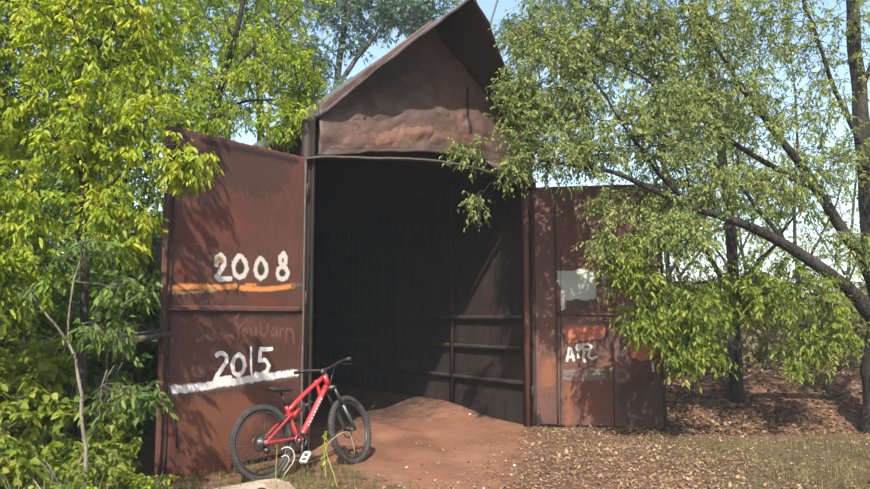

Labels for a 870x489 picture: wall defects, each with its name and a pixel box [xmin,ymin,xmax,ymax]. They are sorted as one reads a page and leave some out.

rust [320,75,498,155]
rust [537,352,580,428]